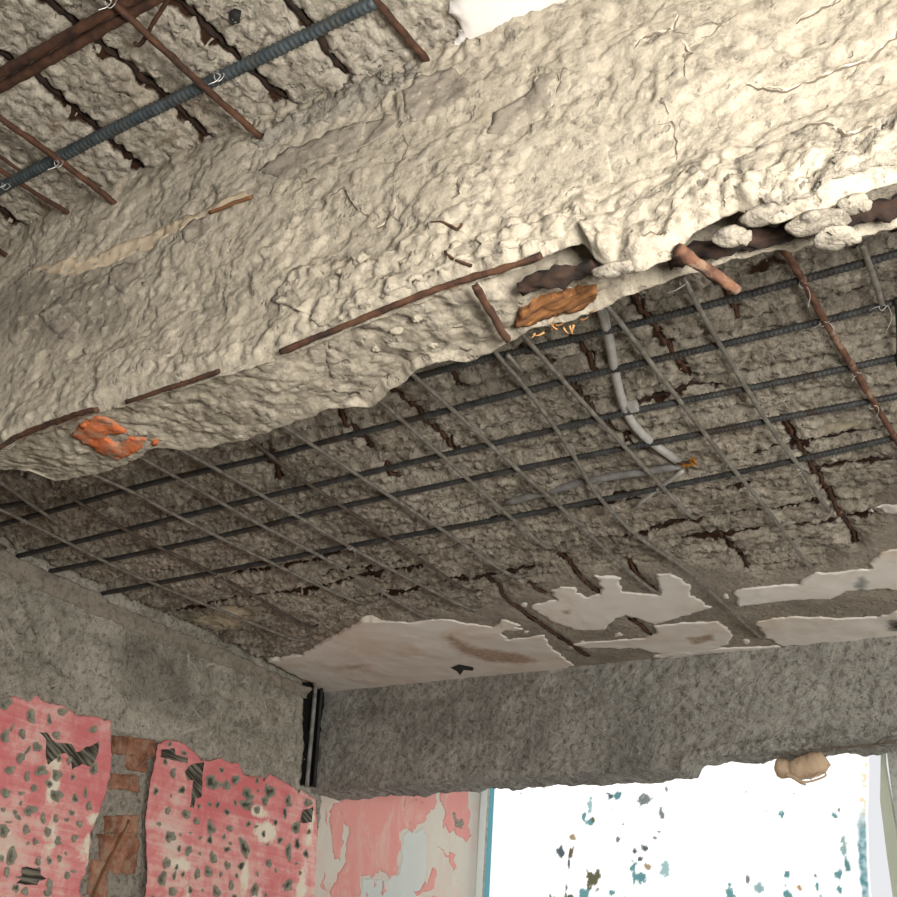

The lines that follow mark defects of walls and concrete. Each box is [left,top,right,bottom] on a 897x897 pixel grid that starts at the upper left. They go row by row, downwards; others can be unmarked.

spalling [0,0,378,196]
crack [634,13,738,77]
crack [796,0,841,24]
crack [744,28,897,93]
corrosion [279,250,602,364]
corrosion [668,220,815,319]
corrosion [847,193,897,233]
peeling [0,212,897,692]
corrosion [753,414,897,543]
flaking render [0,708,176,897]
spalling [156,767,311,897]
peeling [320,791,471,897]